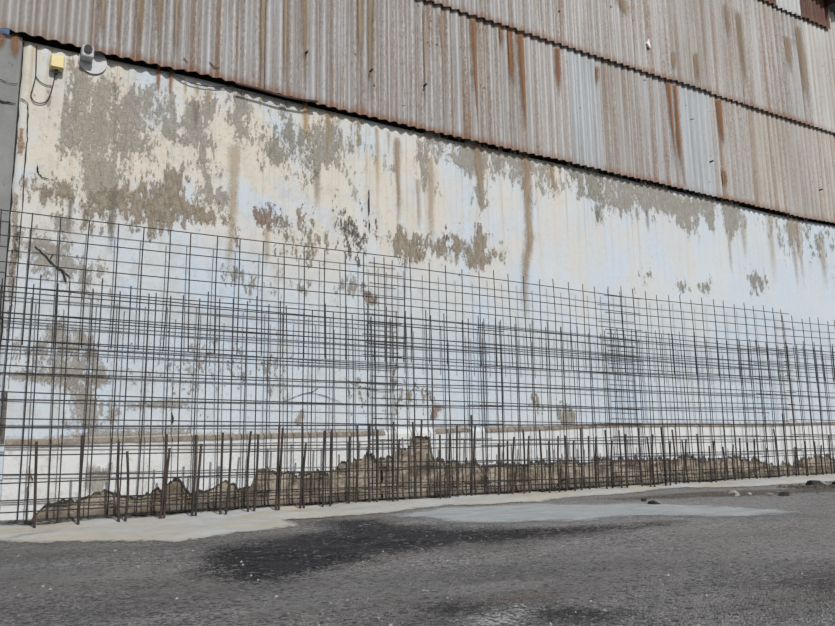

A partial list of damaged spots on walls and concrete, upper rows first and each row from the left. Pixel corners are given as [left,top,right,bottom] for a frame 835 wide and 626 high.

corrosion [157,65,173,90]
corrosion [300,0,309,75]
corrosion [358,0,375,98]
corrosion [470,14,478,108]
corrosion [499,23,527,123]
corrosion [693,54,701,82]
corrosion [724,5,746,78]
corrosion [784,28,809,90]
corrosion [666,81,683,169]
corrosion [716,99,724,142]
corrosion [417,156,434,221]
peeling [0,55,835,521]